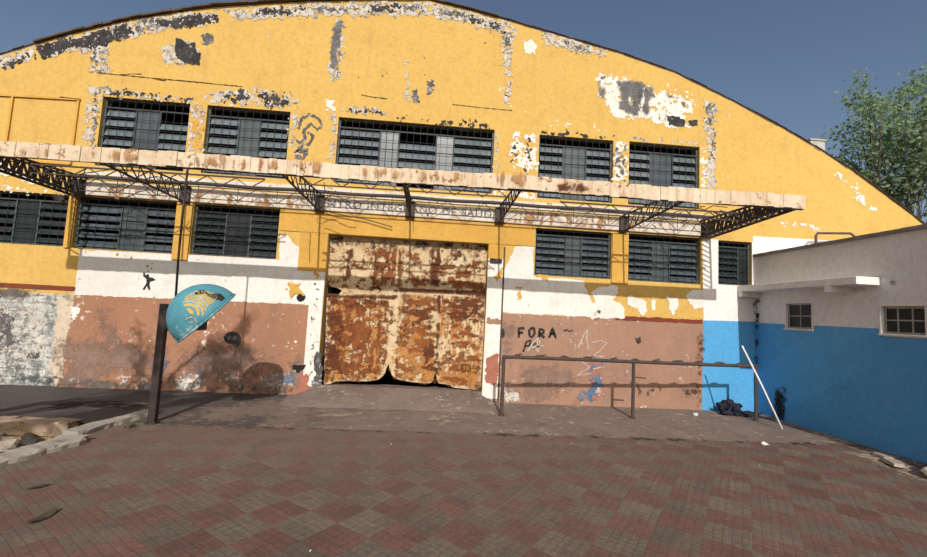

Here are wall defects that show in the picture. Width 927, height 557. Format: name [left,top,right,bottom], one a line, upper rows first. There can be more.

peeling [89,44,112,76]
spalling [161,33,214,68]
peeling [327,18,347,82]
spalling [595,73,731,190]
rust [195,155,245,169]
rust [362,167,438,180]
rust [497,171,527,186]
rust [557,182,589,191]
rust [324,237,487,388]
peeling [589,285,705,322]
peeling [0,298,55,378]